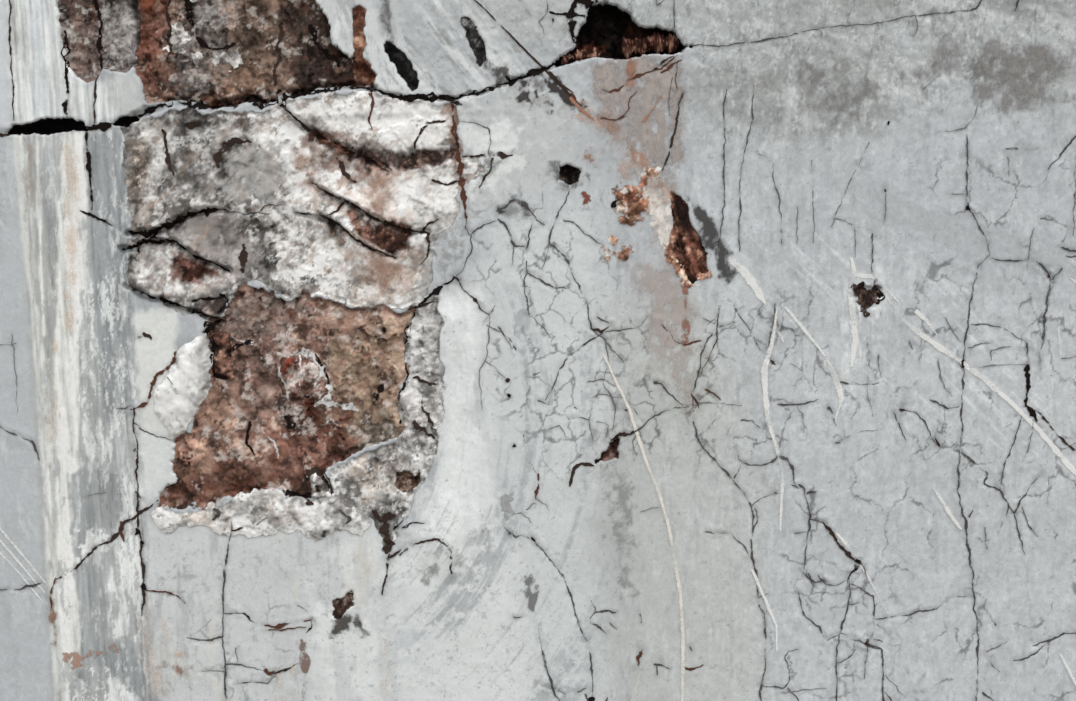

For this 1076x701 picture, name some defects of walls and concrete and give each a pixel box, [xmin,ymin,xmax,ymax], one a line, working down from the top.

crack [7,0,15,121]
crack [0,332,185,616]
crack [61,30,439,328]
spalling [58,0,483,554]
crack [138,63,1076,701]
corrosion [577,56,736,403]
crack [600,0,982,171]
hole [851,281,885,317]